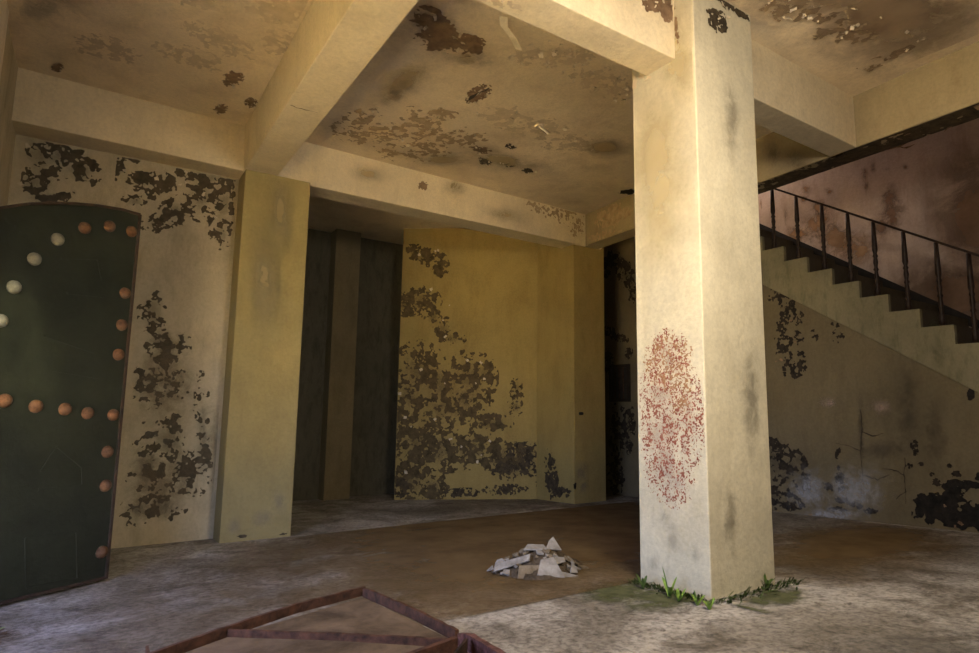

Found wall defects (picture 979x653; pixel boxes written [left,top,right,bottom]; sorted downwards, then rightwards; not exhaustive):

peeling [72,20,296,88]
flaking render [409,5,486,57]
flaking render [642,0,679,43]
flaking render [706,0,750,33]
peeling [759,0,872,44]
peeling [329,84,601,175]
peeling [406,244,450,278]
peeling [767,289,819,379]
peeling [119,290,213,527]
peeling [394,285,576,500]
rust [639,328,705,510]
peeling [769,437,878,514]